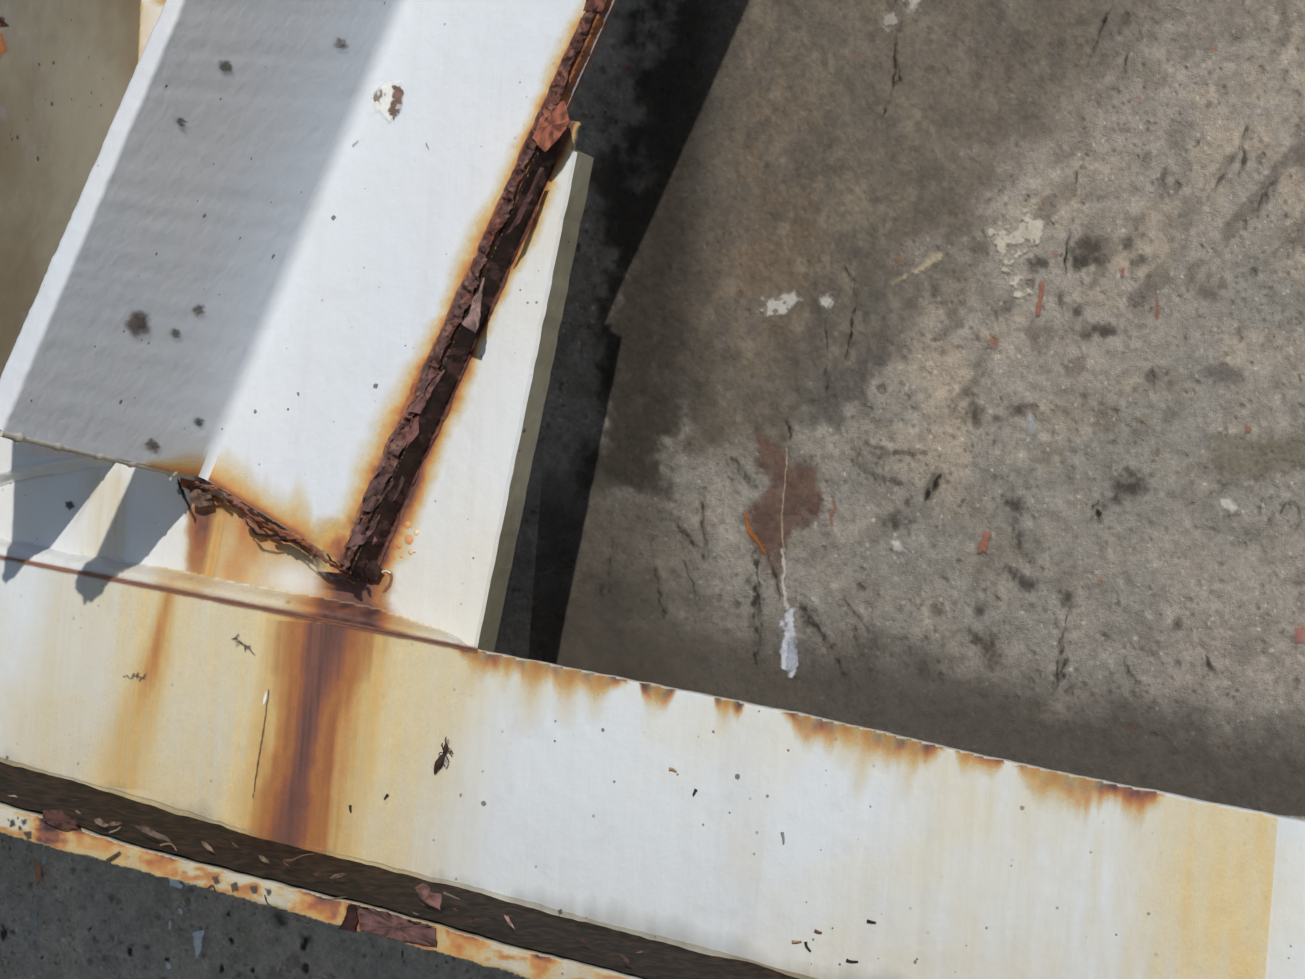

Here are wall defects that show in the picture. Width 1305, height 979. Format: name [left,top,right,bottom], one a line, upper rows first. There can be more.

corrosion [0,18,8,56]
corrosion [89,2,599,872]
corrosion [745,434,836,577]
damp [528,0,1305,816]
corrosion [454,648,676,706]
corrosion [714,697,744,716]
corrosion [782,712,1164,815]
corrosion [0,809,561,979]
corrosion [1152,801,1278,979]